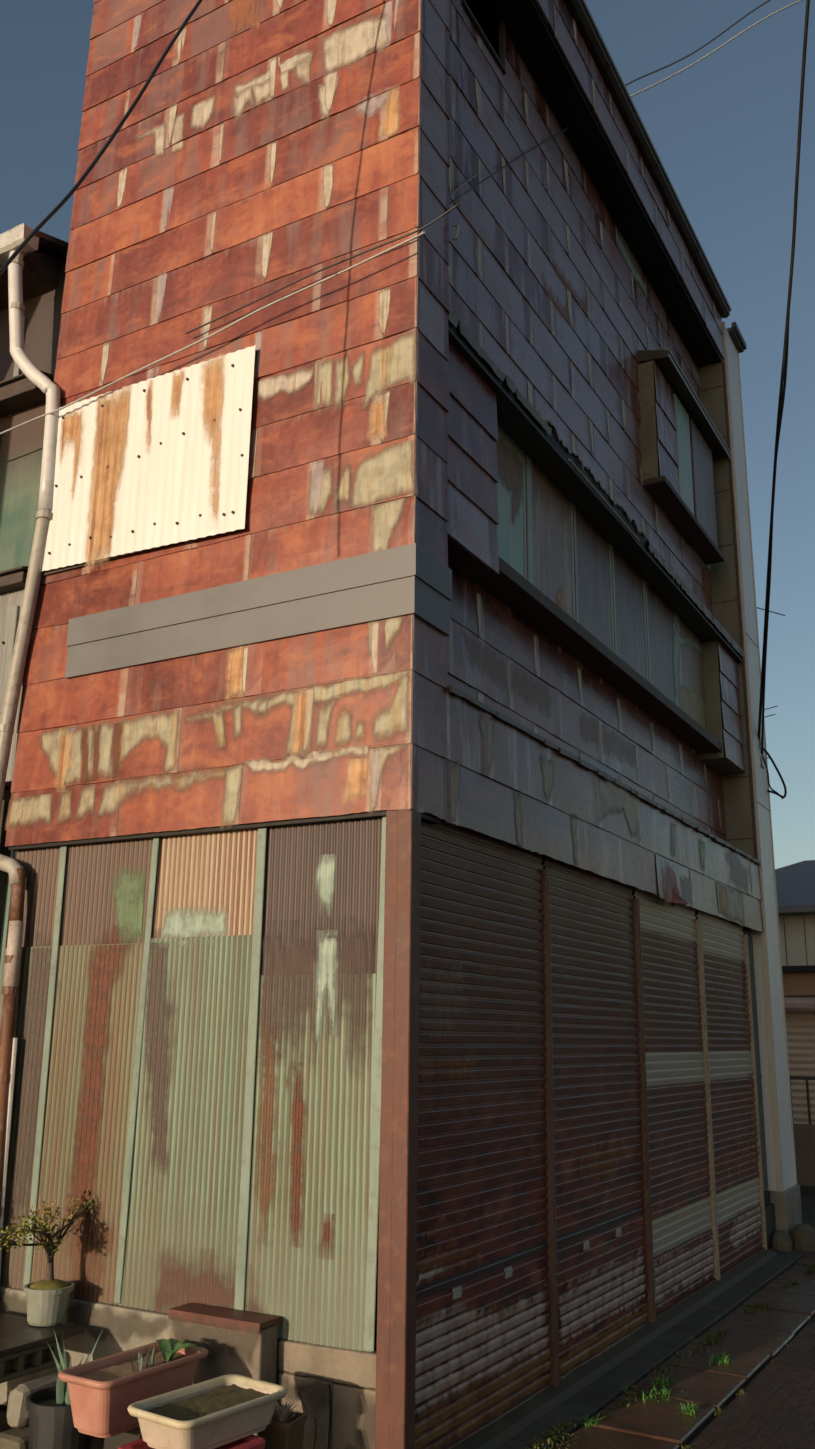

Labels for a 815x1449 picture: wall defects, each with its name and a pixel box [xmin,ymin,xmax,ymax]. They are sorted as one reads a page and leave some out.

peeling [137,96,215,157]
peeling [234,16,388,117]
corrosion [61,382,152,566]
corrosion [171,372,184,415]
corrosion [203,358,224,515]
peeling [257,330,416,408]
peeling [309,440,414,552]
peeling [6,668,409,829]
peeling [679,685,705,729]
corrosion [12,940,52,1214]
corrosion [67,925,130,1301]
corrosion [257,927,373,1233]